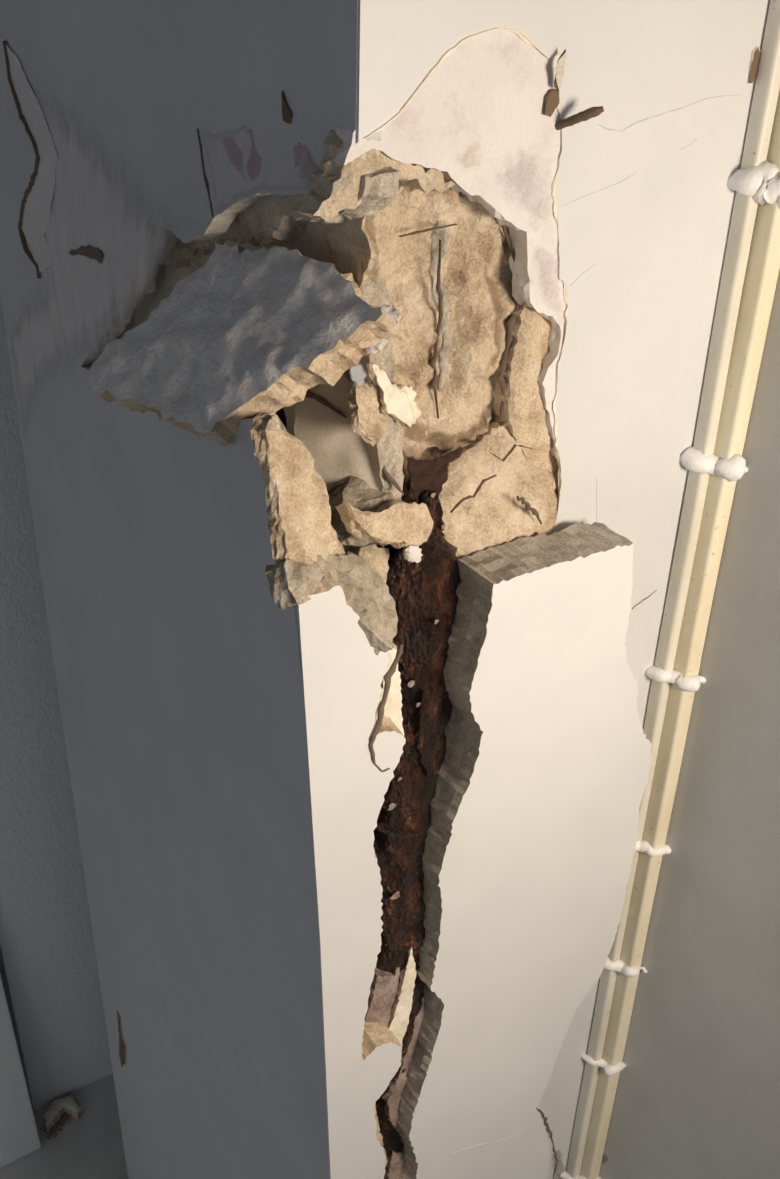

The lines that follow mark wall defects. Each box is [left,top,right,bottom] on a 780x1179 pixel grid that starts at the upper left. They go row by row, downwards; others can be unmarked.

spalling [3,27,567,559]
crack [376,544,396,566]
crack [368,642,406,772]
corrosion [373,433,486,1082]
corrosion [375,1096,404,1170]
crack [364,946,425,1179]